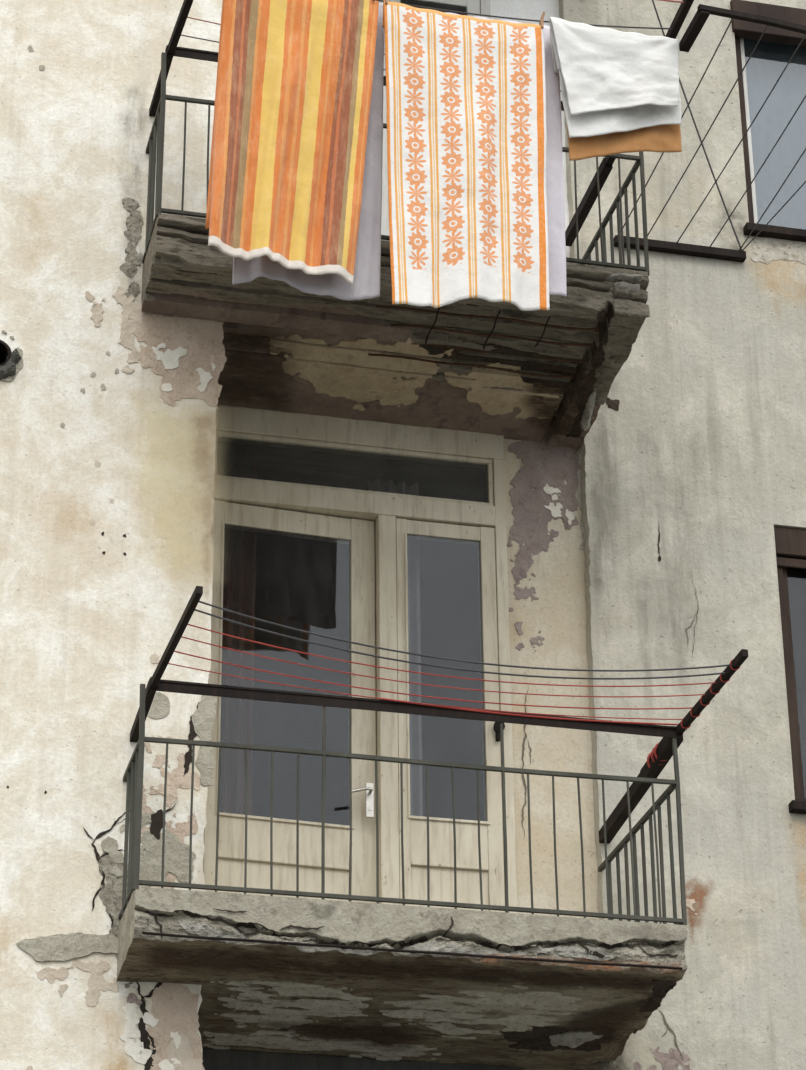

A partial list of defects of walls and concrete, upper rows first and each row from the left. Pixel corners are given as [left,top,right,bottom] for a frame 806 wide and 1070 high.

peeling [85,197,227,409]
peeling [269,300,620,651]
crack [83,812,130,928]
crack [136,982,163,1070]
spalling [99,695,217,938]
peeling [36,954,616,1070]
crack [145,908,680,958]
spalling [142,921,683,1013]
peeling [634,1043,691,1070]
corrosion [686,885,707,927]